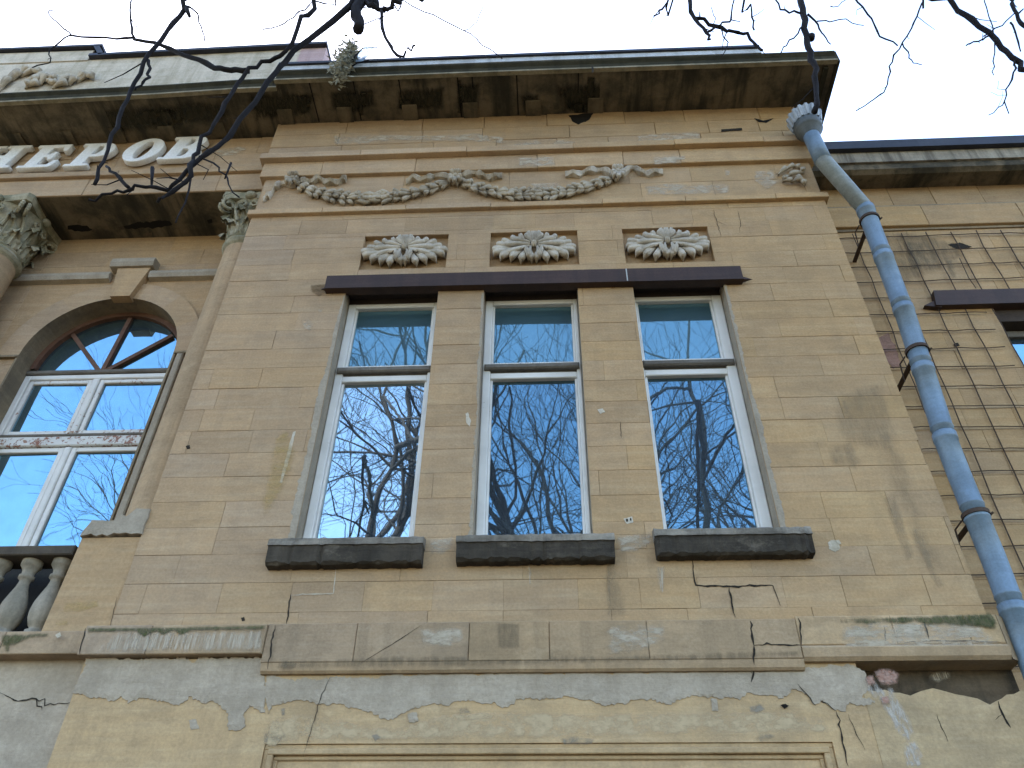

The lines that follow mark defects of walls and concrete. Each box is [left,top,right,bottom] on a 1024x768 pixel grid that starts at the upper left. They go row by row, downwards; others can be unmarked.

crack [267,570,336,669]
crack [692,560,802,682]
crack [1,693,70,708]
crack [303,680,329,757]
crack [799,686,865,767]
spalling [867,669,897,704]